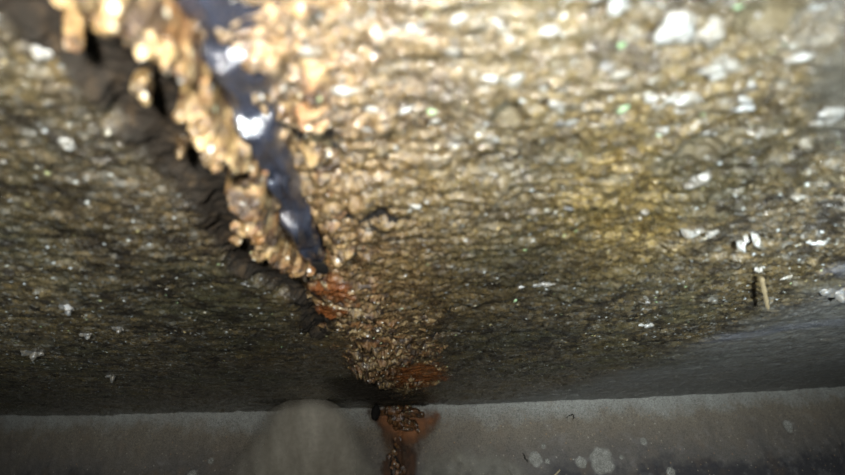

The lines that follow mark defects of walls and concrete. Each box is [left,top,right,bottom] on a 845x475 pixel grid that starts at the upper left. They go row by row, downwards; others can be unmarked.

spalling [0,0,332,339]
rust [53,0,449,475]